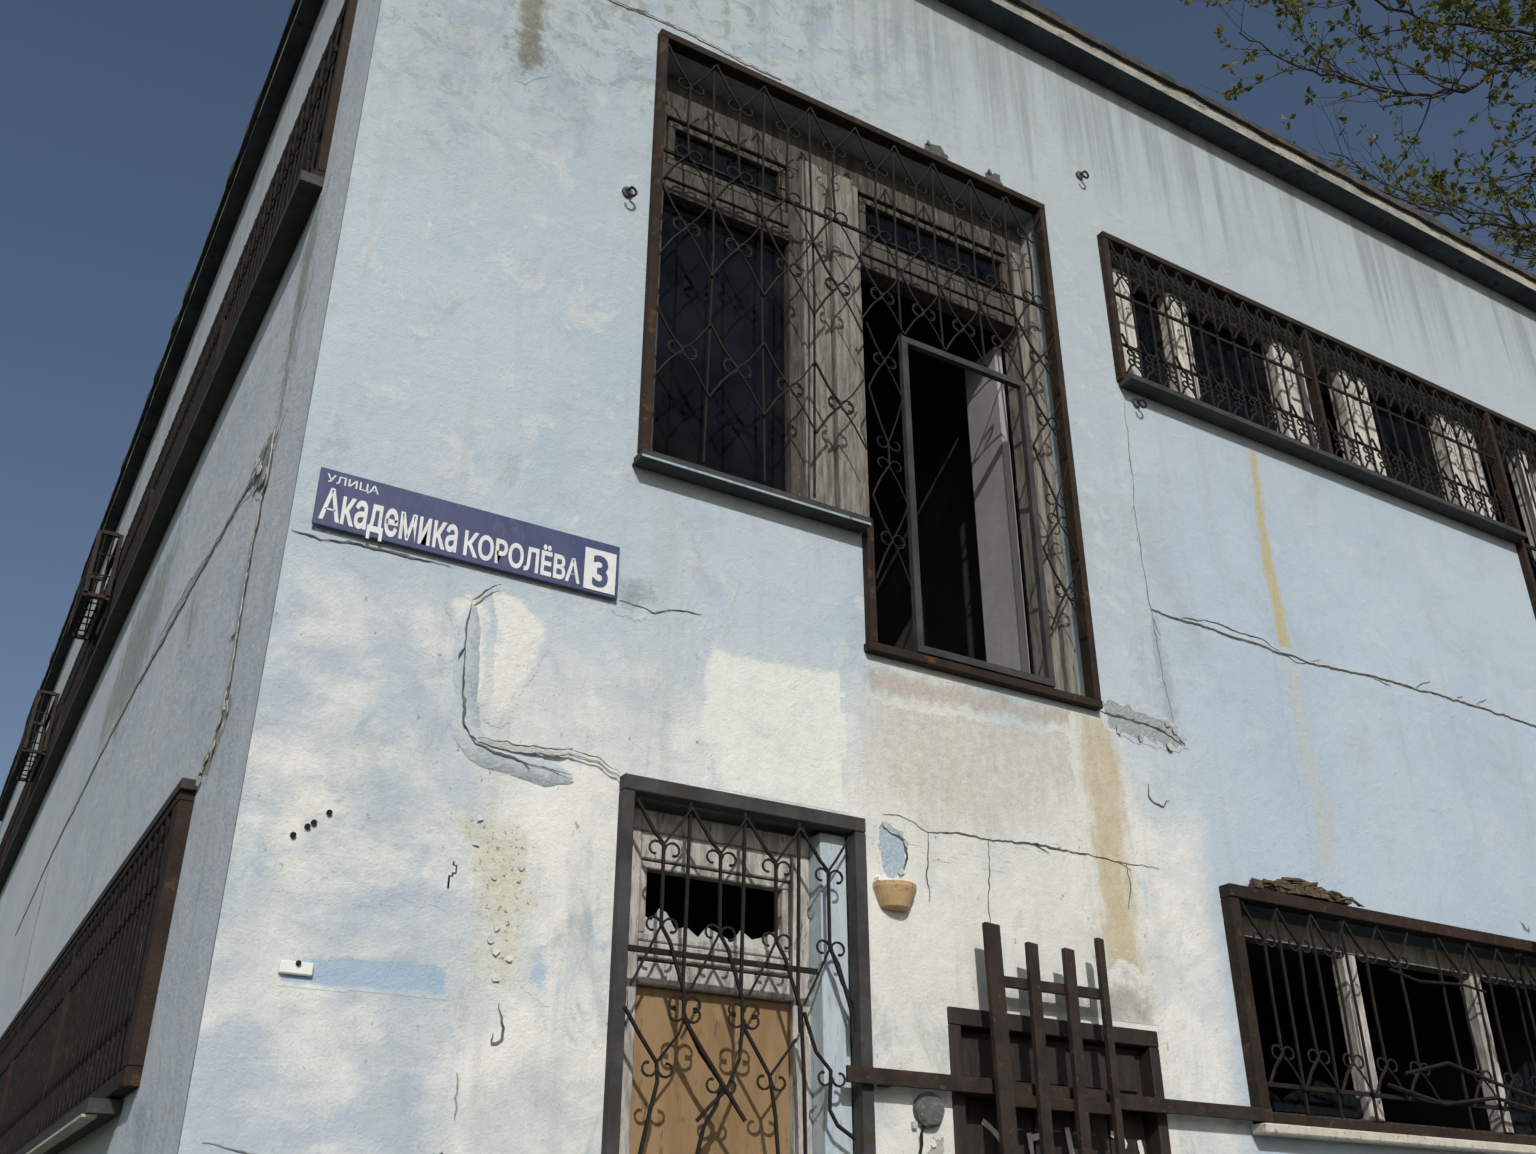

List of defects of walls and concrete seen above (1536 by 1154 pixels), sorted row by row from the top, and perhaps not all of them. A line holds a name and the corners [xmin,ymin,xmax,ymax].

crack [15,426,451,1014]
crack [458,584,620,777]
damp [839,637,1078,873]
crack [885,814,1159,923]
crack [1100,404,1536,746]